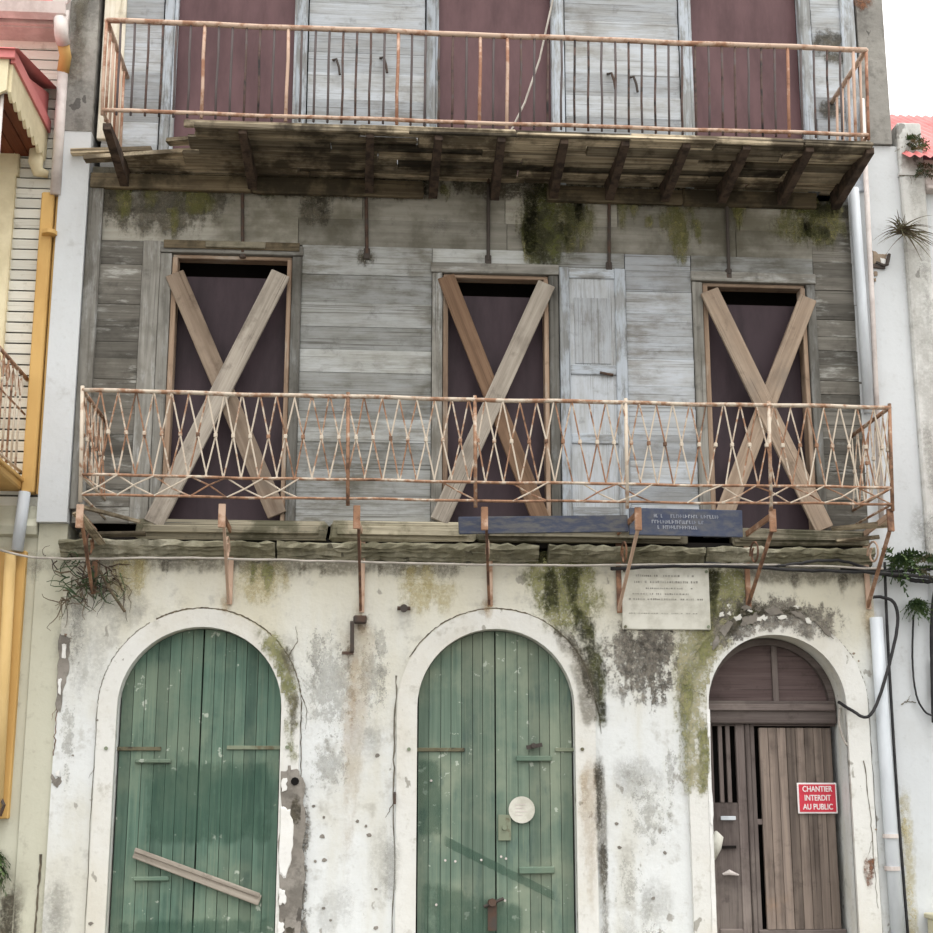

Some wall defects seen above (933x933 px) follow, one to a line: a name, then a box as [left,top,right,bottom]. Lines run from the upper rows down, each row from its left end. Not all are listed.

leakage [440,181,587,265]
leakage [796,203,839,239]
spalling [712,604,834,651]
spalling [55,634,70,712]
leakage [539,567,842,786]
spalling [51,771,62,788]
peeling [277,765,327,933]
leakage [600,844,608,900]
leakage [0,894,15,933]